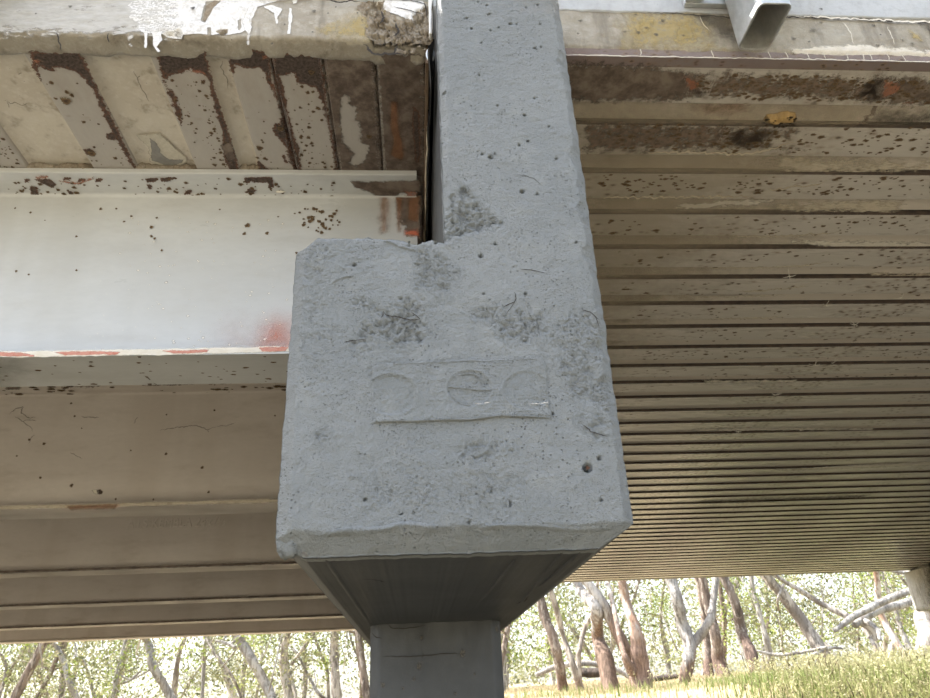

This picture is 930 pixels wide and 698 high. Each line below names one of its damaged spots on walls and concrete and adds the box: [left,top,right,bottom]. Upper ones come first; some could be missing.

spalling [357,1,433,47]
peeling [0,0,383,170]
rust [567,61,930,105]
rust [135,79,335,196]
rust [585,121,829,154]
rust [841,127,930,155]
rust [8,177,110,195]
rust [294,207,341,234]